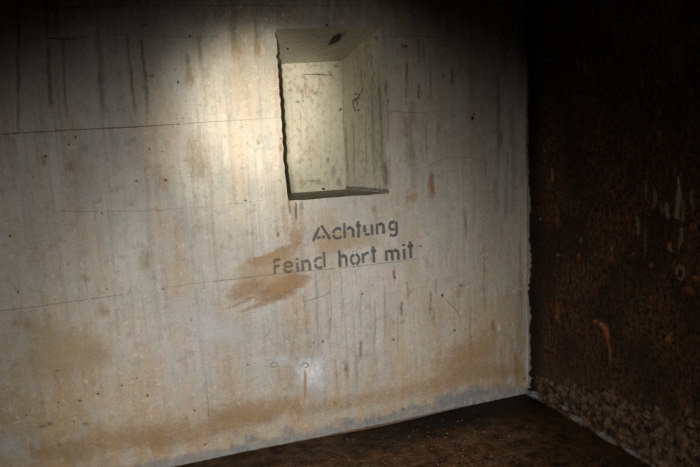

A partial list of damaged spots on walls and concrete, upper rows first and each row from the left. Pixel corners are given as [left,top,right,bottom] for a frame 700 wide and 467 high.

leakage [277,356,325,389]
leakage [137,386,539,467]